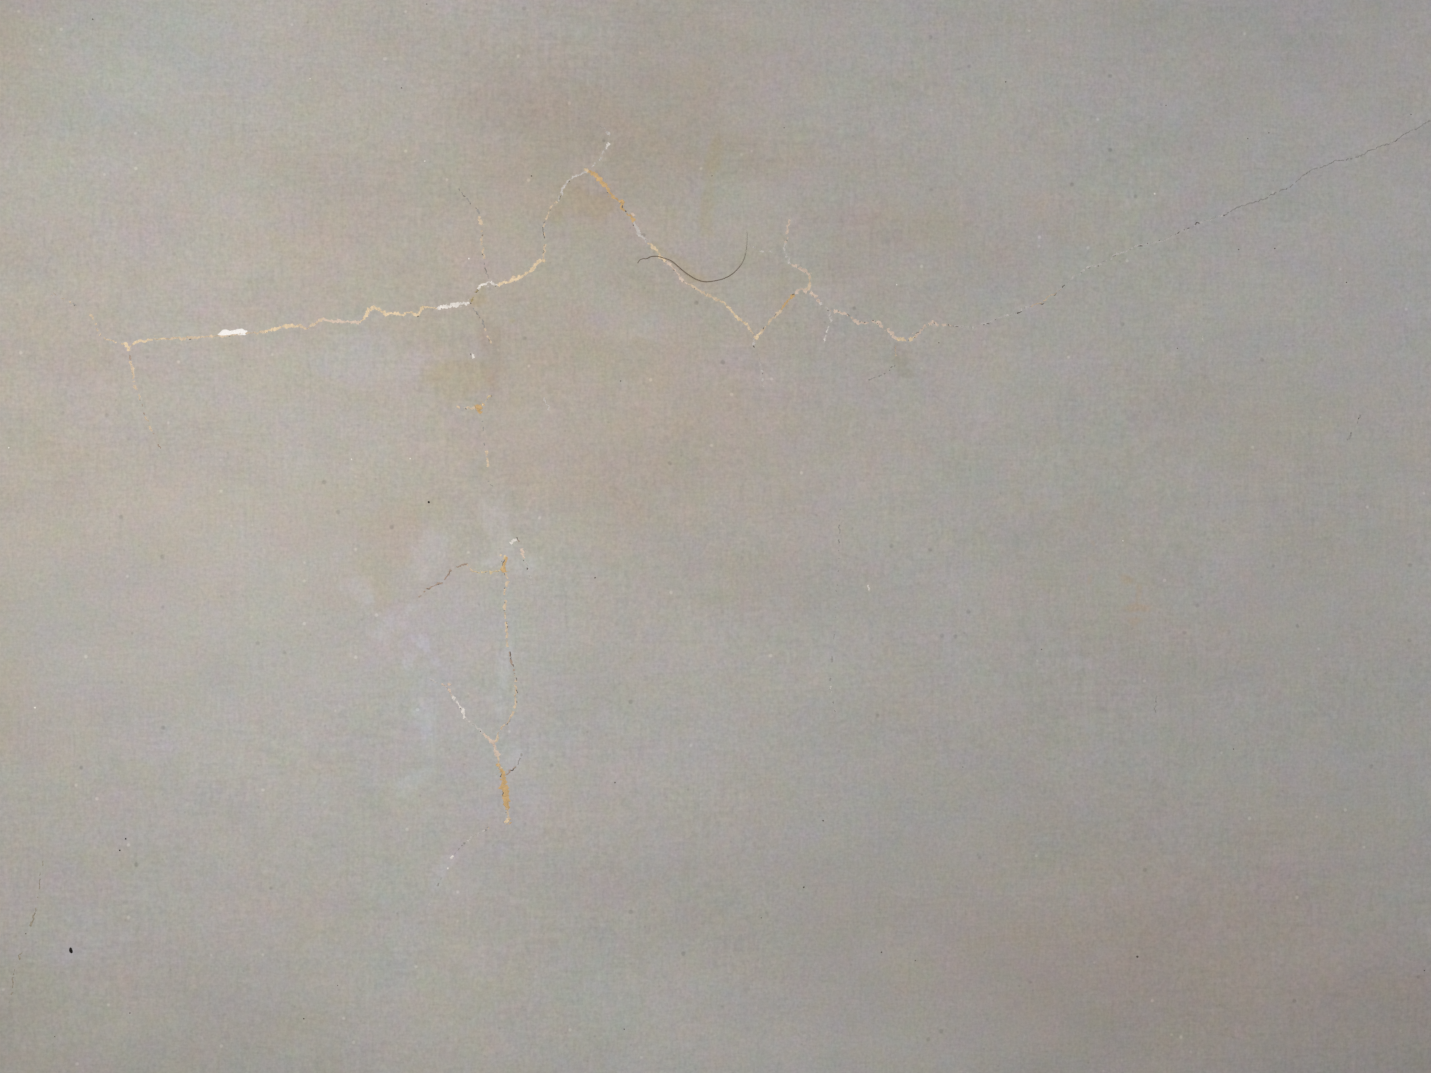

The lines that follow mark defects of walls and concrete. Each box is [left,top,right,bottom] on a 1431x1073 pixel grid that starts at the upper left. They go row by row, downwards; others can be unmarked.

crack [456,395,493,486]
crack [51,120,1431,449]
crack [418,538,532,906]